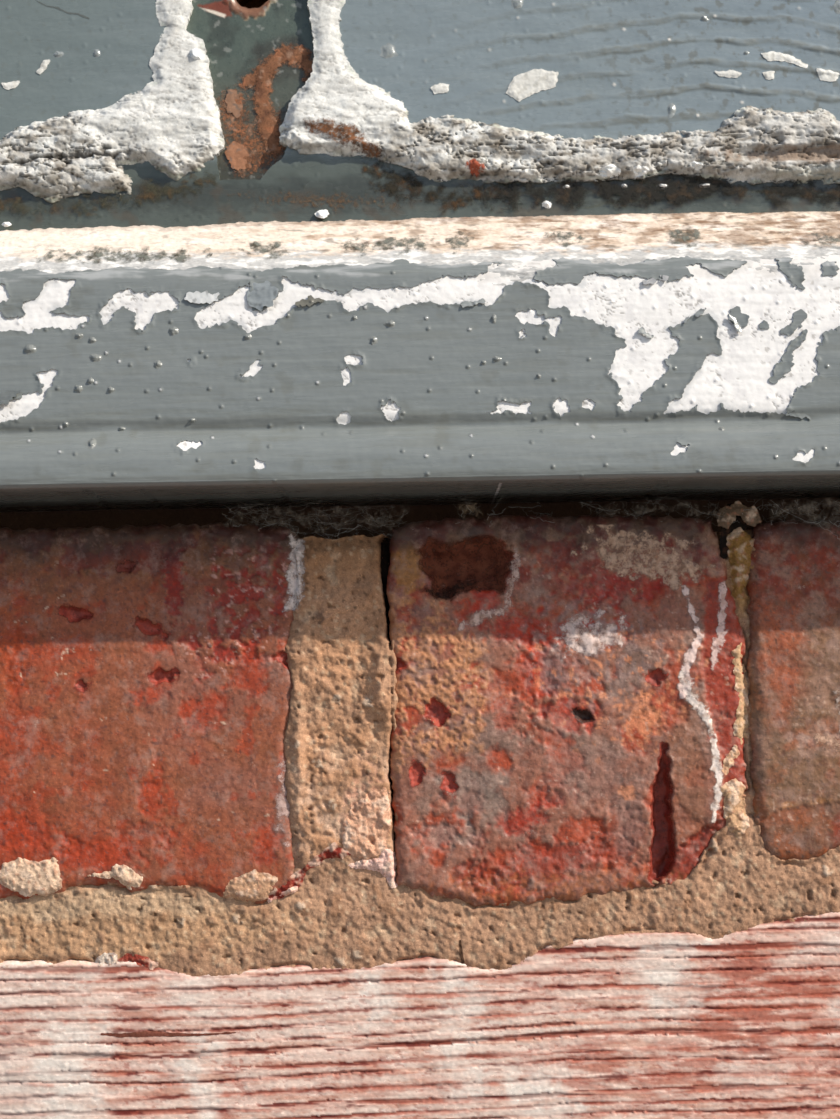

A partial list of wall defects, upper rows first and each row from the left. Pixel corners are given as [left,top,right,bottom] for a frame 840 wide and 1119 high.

corrosion [217,43,313,178]
peeling [431,83,450,94]
peeling [506,69,559,102]
peeling [714,70,742,78]
peeling [761,51,839,82]
damp [477,173,748,212]
damp [763,179,840,209]
peeling [0,255,840,423]
crack [380,538,391,645]
damp [571,525,728,822]
crack [389,768,397,874]
spalling [647,741,676,884]